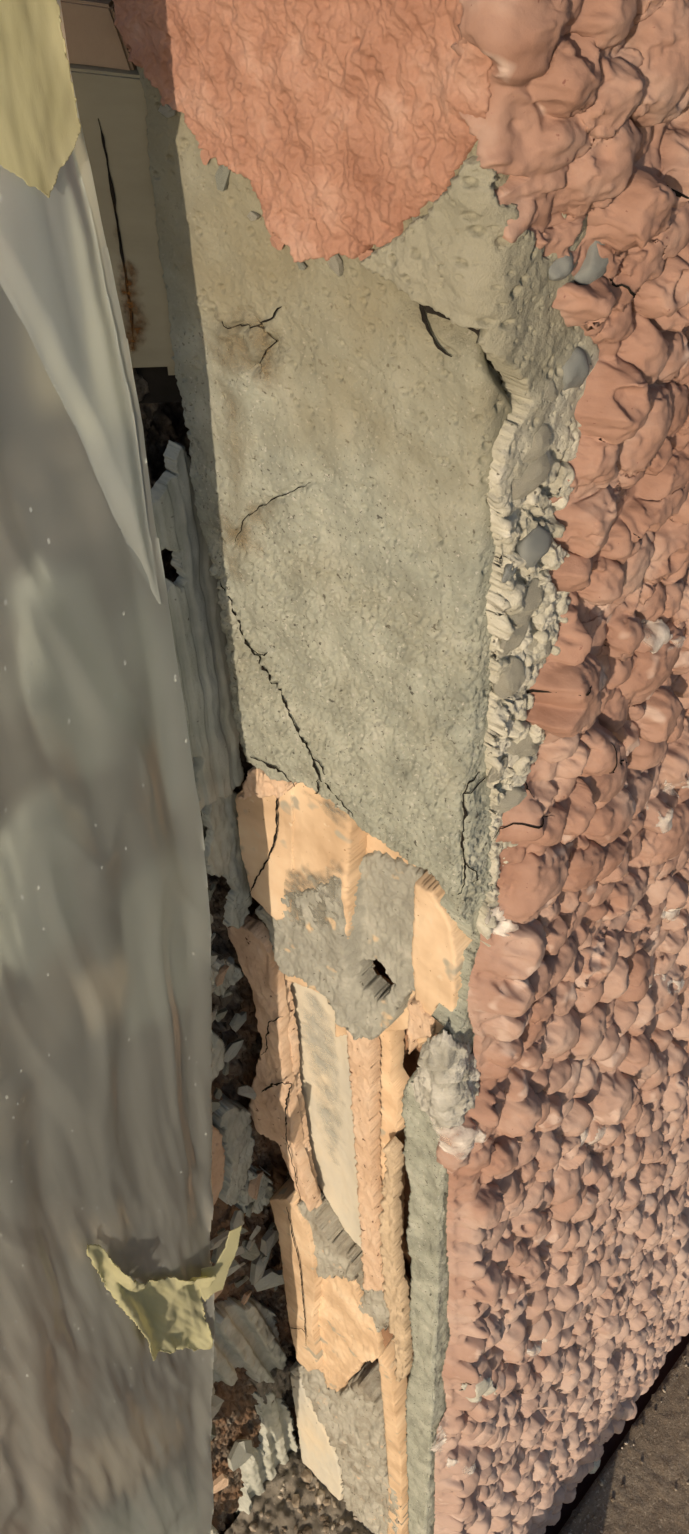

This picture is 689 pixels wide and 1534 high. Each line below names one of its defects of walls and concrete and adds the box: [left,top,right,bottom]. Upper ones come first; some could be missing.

corrosion [121,262,143,350]
crack [419,304,502,377]
crack [220,583,353,897]
spalling [135,66,609,1534]
crack [457,772,552,895]